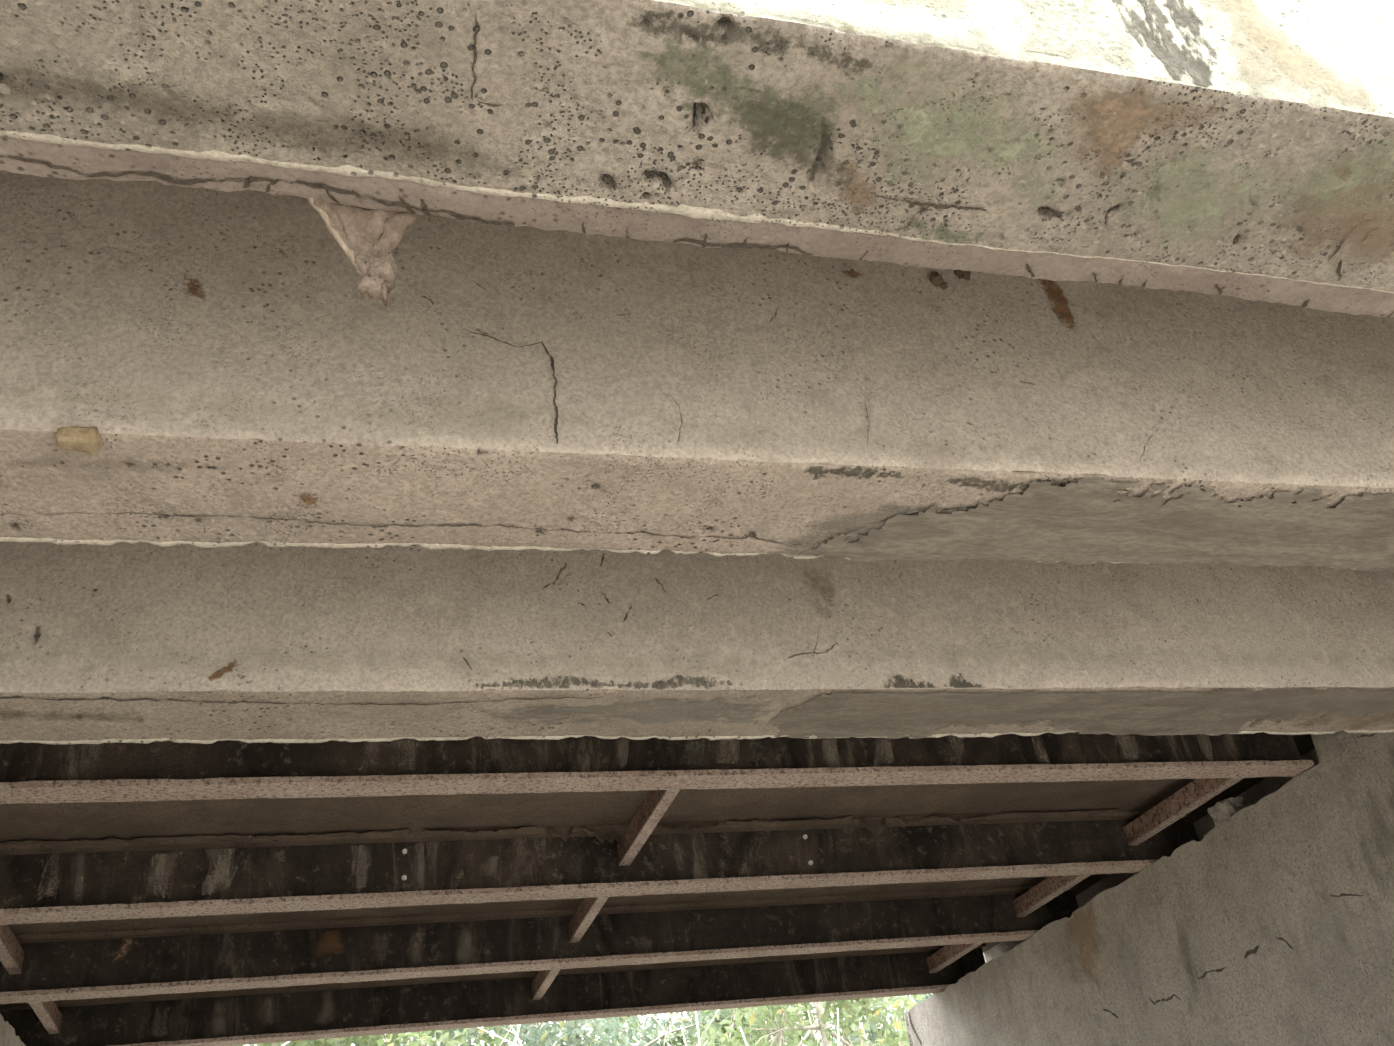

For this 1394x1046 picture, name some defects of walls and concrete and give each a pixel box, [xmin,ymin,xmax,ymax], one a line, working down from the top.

damp [866,26,998,53]
damp [1022,0,1217,87]
peeling [308,197,425,307]
rust [1041,279,1074,328]
crack [465,329,558,444]
crack [1330,891,1363,899]
crack [1149,937,1294,1005]